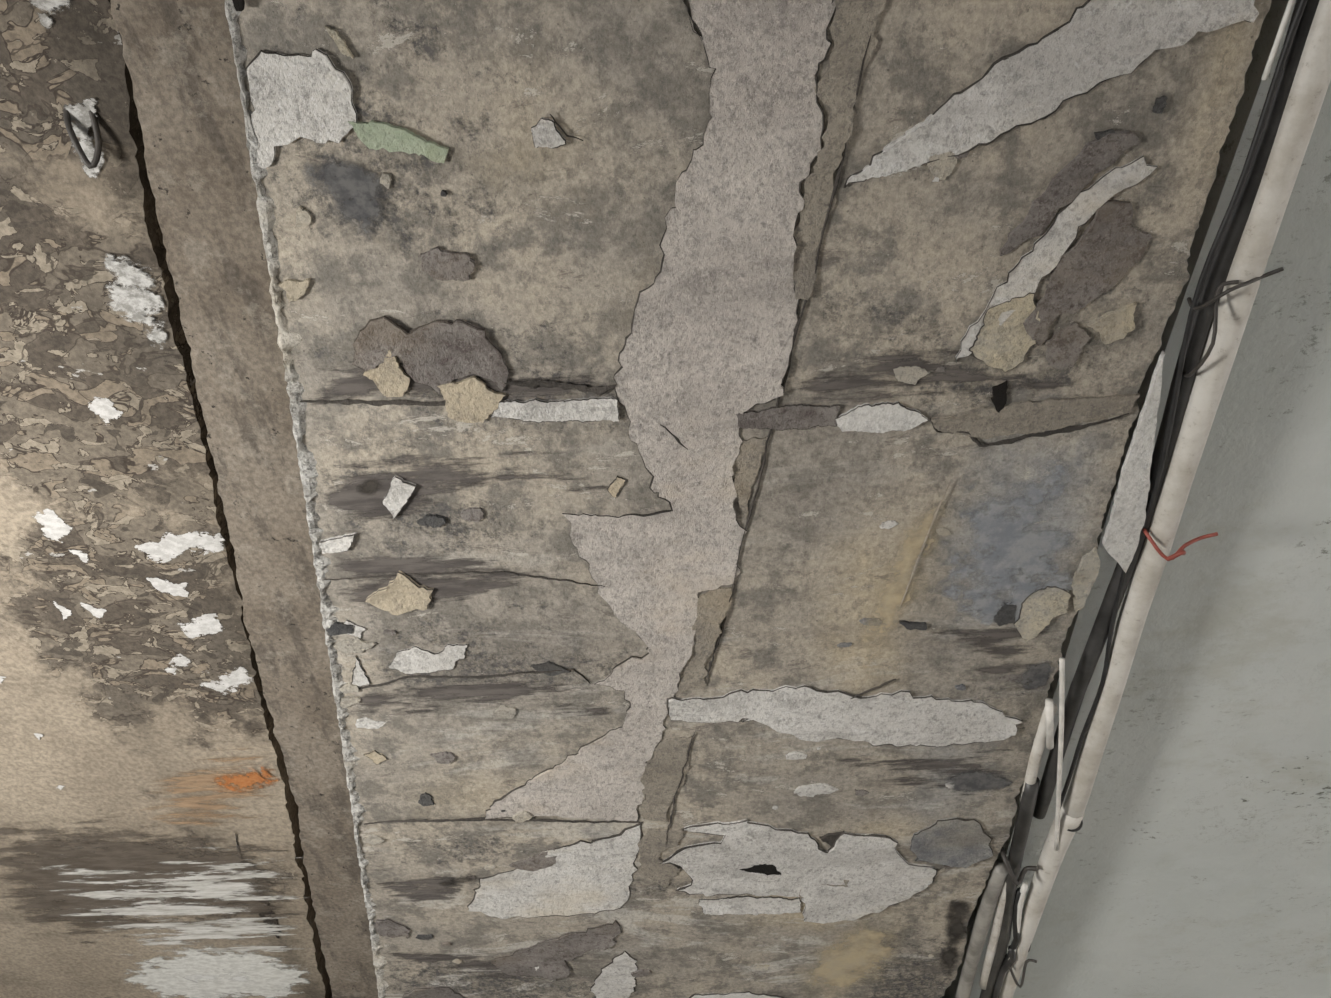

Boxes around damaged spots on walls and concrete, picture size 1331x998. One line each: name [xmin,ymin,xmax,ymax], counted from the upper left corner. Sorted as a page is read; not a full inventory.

leakage [31,0,70,28]
leakage [64,98,104,178]
leakage [104,254,167,349]
peeling [225,0,468,998]
peeling [352,0,1259,998]
leakage [0,817,309,998]